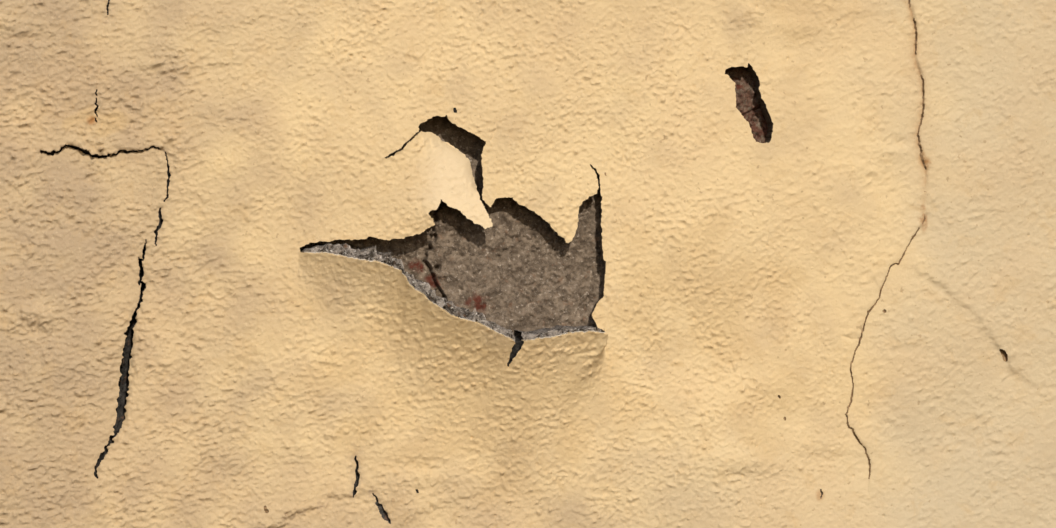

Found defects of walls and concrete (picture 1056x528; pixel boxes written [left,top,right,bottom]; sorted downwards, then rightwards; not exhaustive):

crack [35,0,173,480]
spalling [300,105,609,342]
hole [725,63,773,143]
crack [839,0,1043,496]